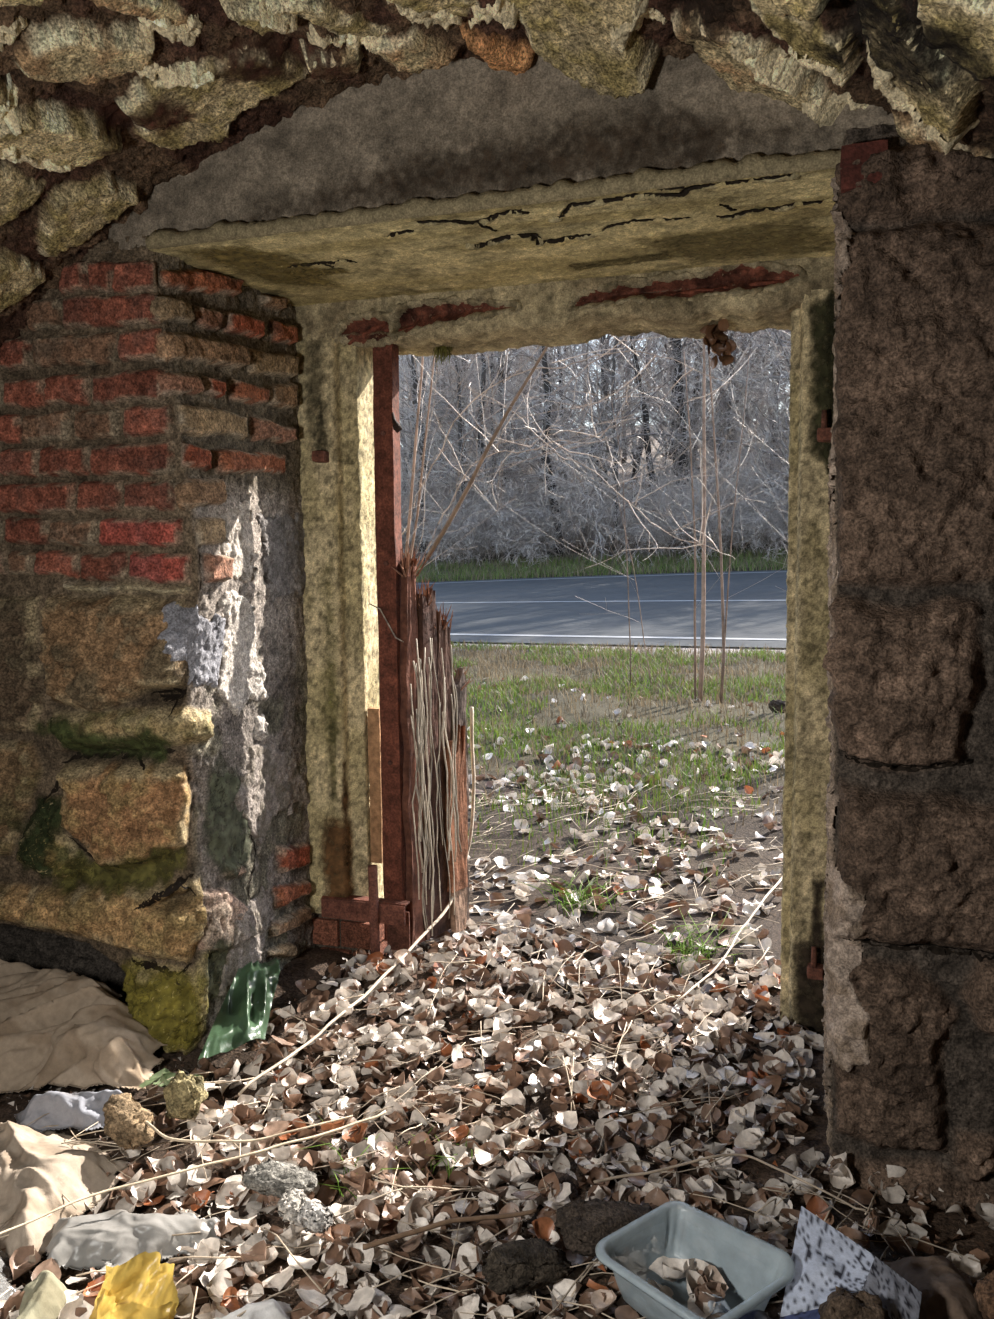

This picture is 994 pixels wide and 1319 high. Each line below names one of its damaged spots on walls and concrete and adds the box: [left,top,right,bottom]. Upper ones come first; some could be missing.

crack [387,173,823,251]
crack [287,259,357,268]